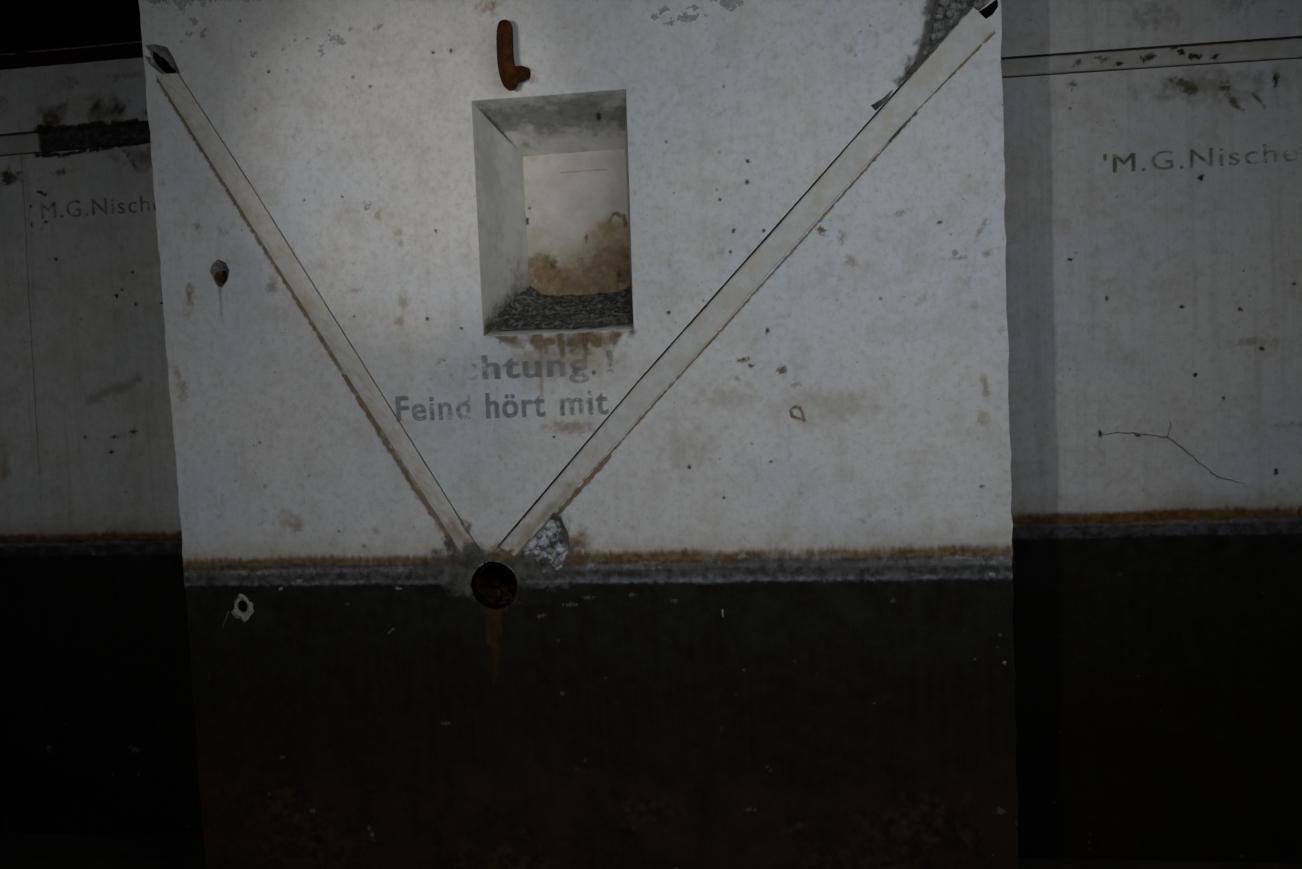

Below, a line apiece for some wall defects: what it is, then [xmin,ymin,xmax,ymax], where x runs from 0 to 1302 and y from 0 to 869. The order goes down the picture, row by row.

spalling [871,0,991,111]
corrosion [157,79,471,560]
corrosion [495,330,634,359]
corrosion [556,32,995,514]
crack [1099,420,1247,484]
spalling [518,512,588,581]